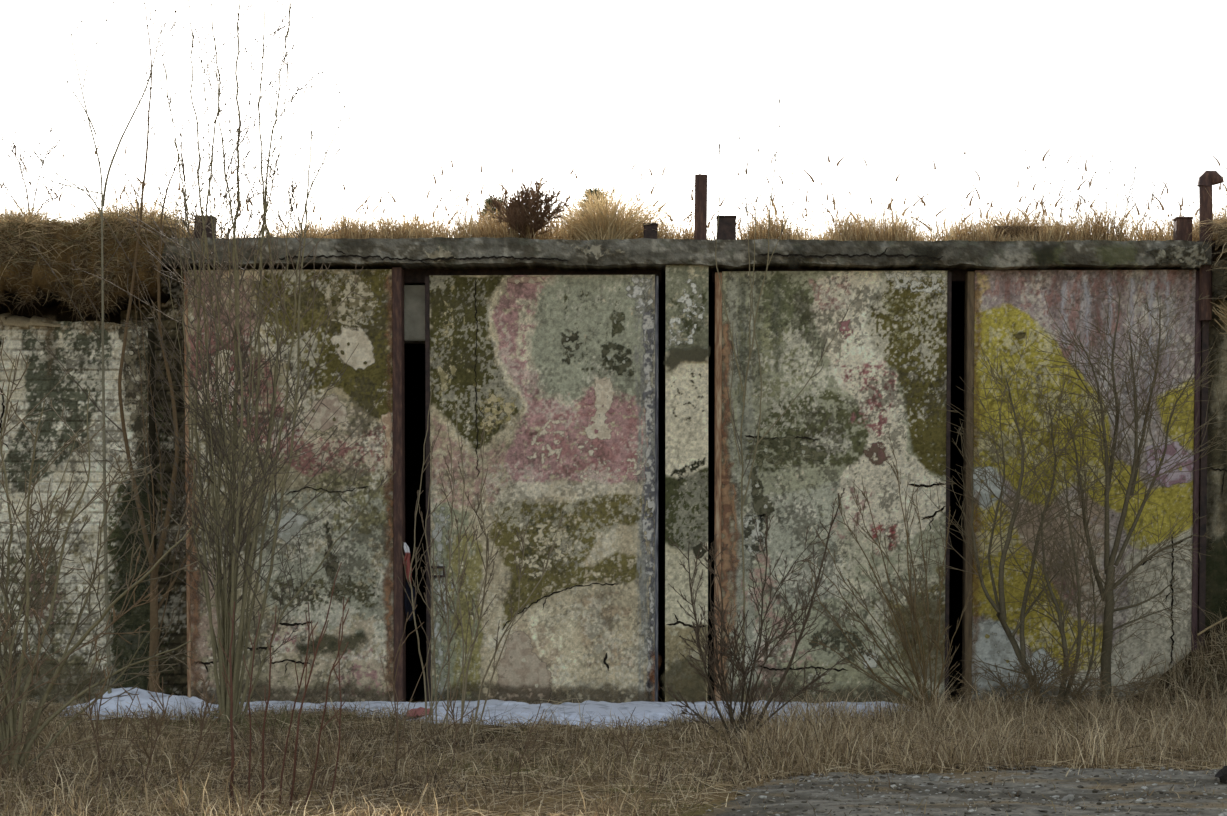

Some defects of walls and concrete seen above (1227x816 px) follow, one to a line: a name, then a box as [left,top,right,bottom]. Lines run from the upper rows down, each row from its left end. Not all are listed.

peeling [323,274,376,370]
peeling [885,271,946,293]
leakage [0,460,151,703]
peeling [270,521,371,608]
crack [286,486,370,505]
peeling [514,524,574,578]
peeling [527,275,707,702]
corrosion [721,323,740,695]
peeling [743,434,828,557]
peeling [863,442,891,465]
peeling [497,631,552,703]
peeling [809,629,878,668]